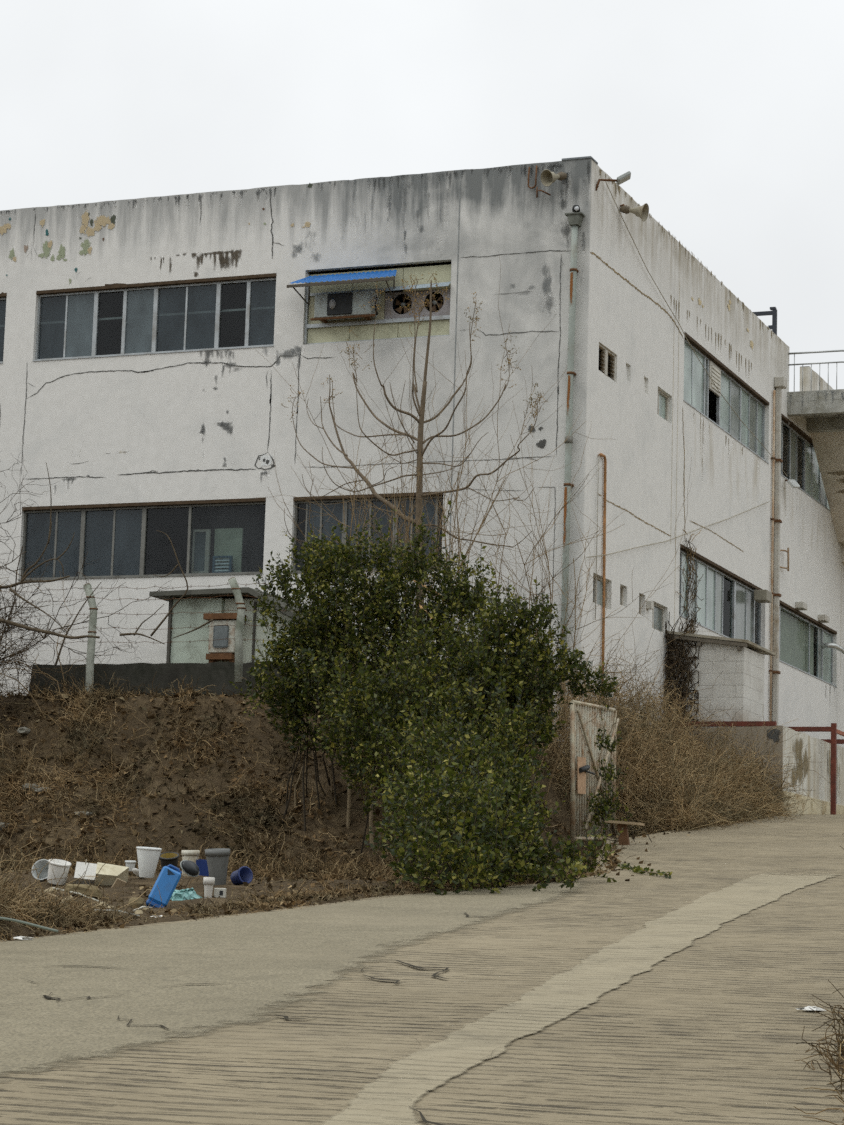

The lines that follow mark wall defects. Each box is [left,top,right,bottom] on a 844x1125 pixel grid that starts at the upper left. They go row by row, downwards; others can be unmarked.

peeling [9,210,116,284]
crack [0,351,332,479]
crack [355,250,683,466]